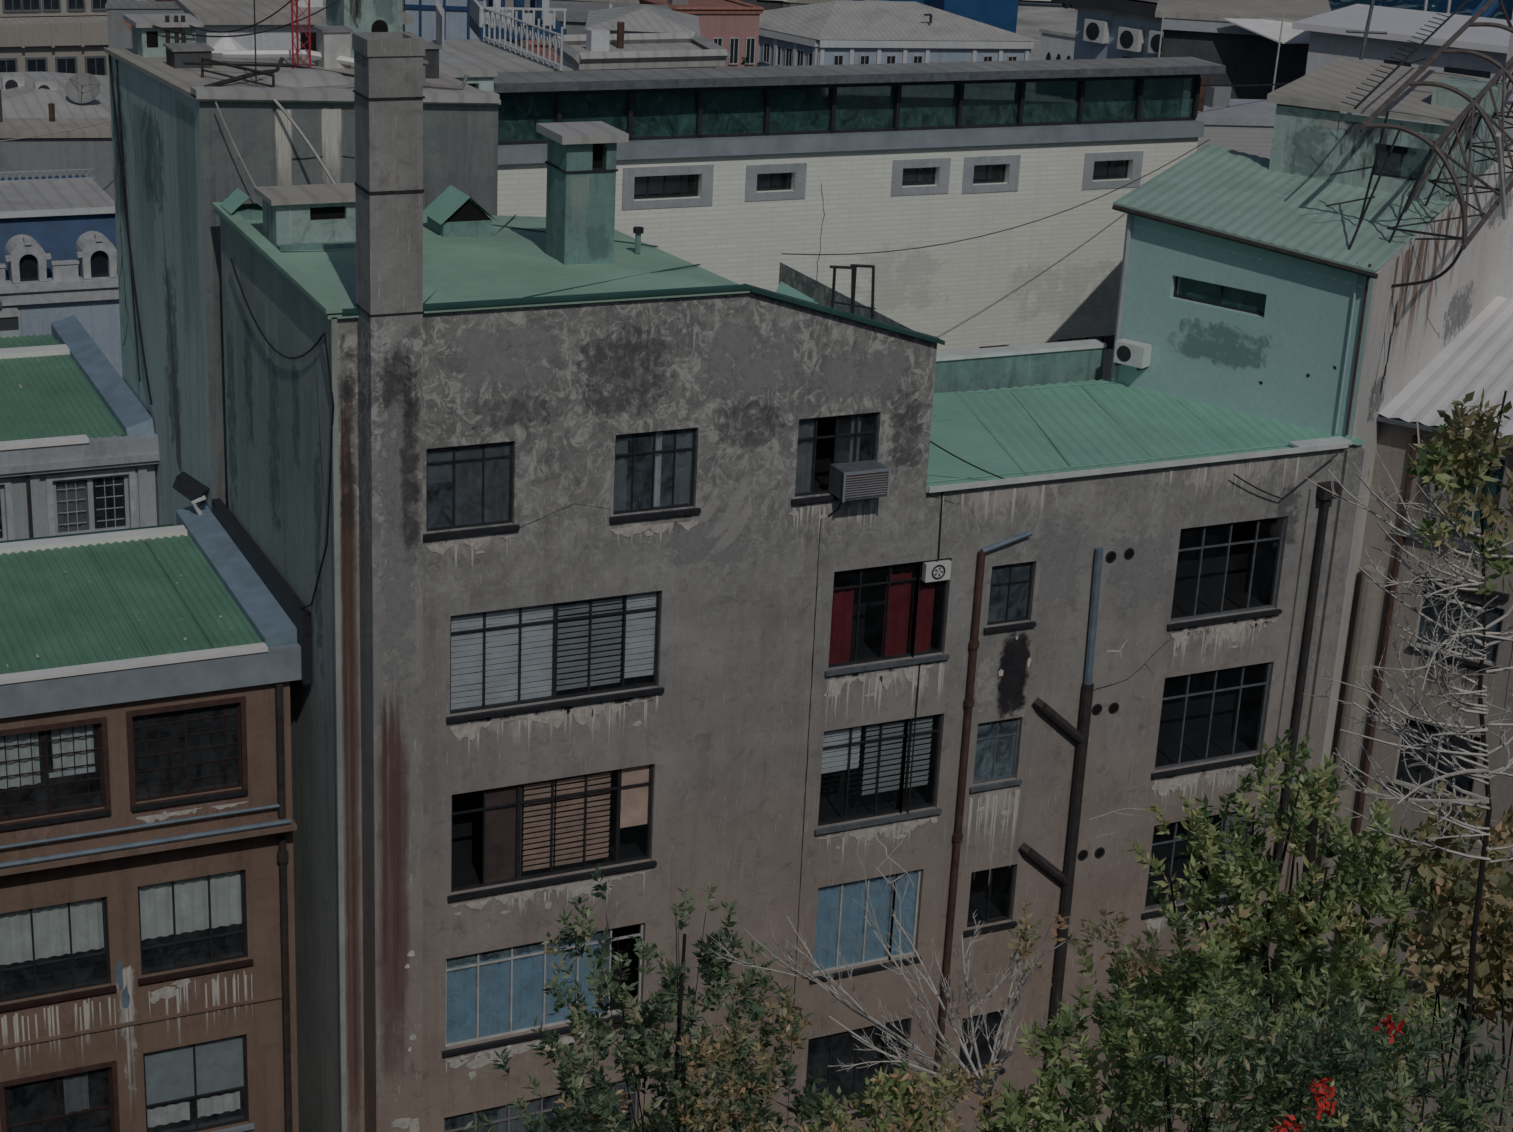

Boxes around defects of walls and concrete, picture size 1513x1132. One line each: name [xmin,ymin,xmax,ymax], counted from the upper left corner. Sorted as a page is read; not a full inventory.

leakage [162,216,181,473]
leakage [483,706,574,723]
corrosion [381,714,407,1056]
leakage [117,966,137,1089]